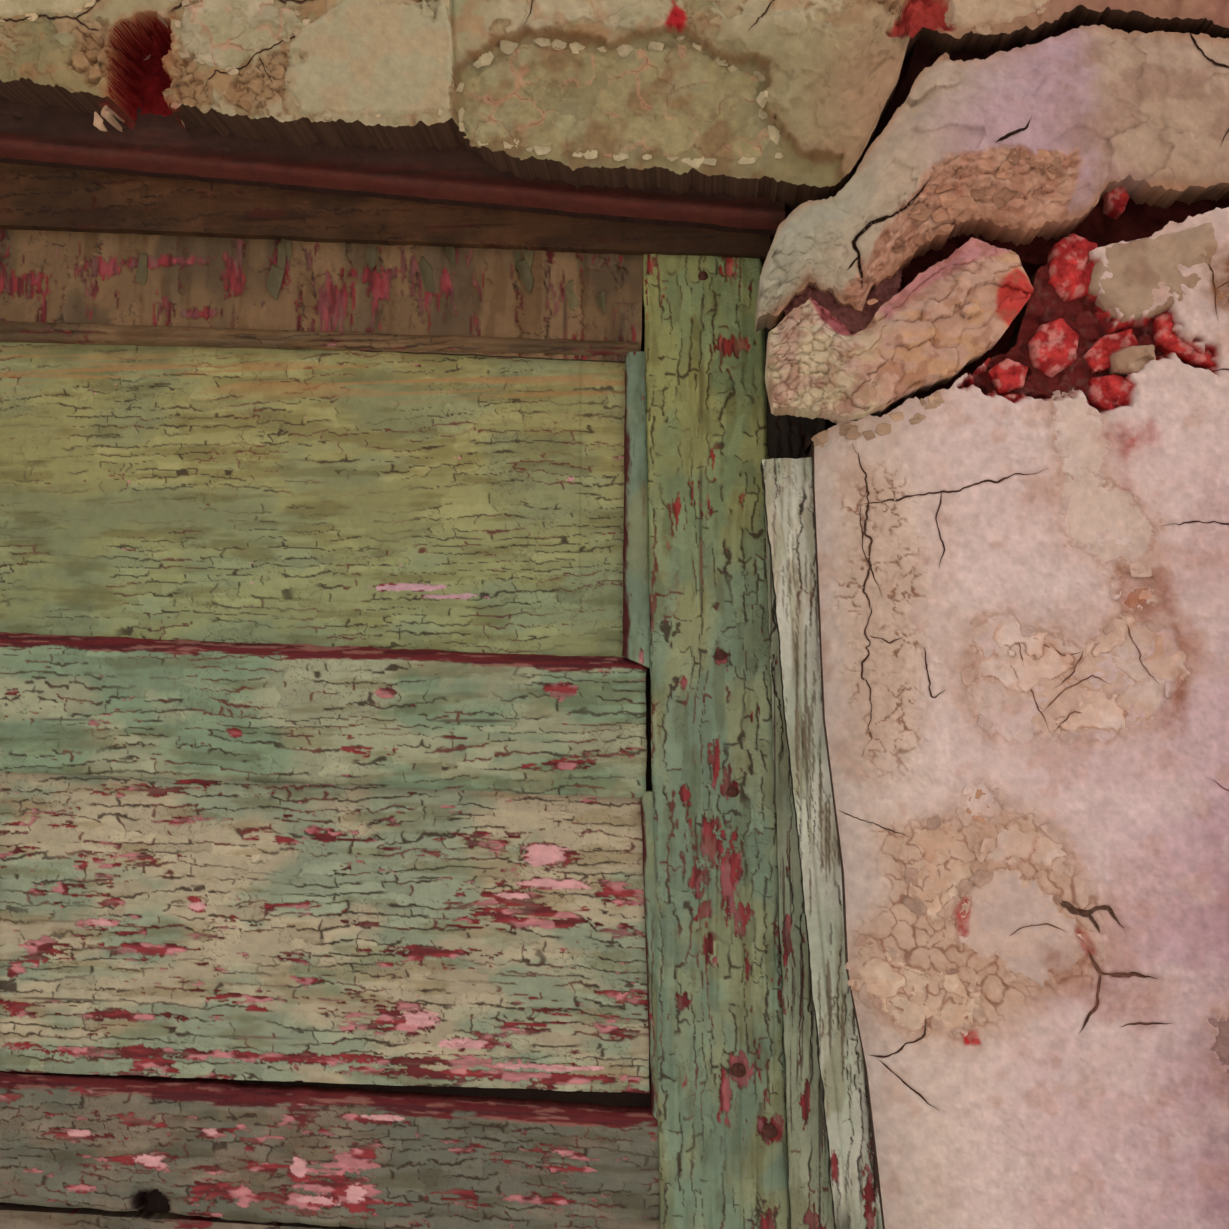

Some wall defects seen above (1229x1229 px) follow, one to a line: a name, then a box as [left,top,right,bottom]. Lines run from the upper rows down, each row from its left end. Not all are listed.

peeling [811,391,944,448]
crack [854,449,1048,754]
peeling [960,387,1190,745]
crack [1161,519,1229,527]
crack [841,811,911,838]
spalling [898,785,1107,988]
crack [870,1024,937,1109]
peeling [845,935,986,1039]
crack [1060,901,1158,1034]
crack [1122,1020,1172,1028]